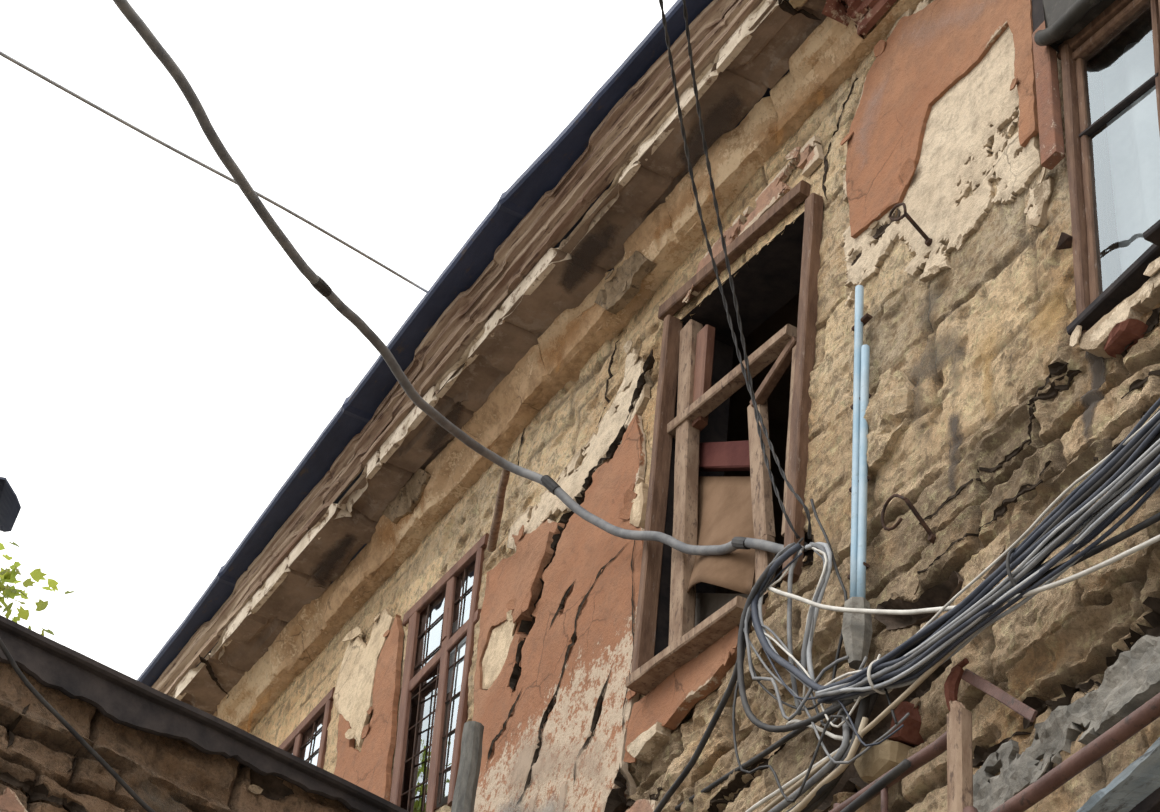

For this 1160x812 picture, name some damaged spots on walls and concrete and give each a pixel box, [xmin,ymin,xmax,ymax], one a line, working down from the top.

spalling [789,0,807,9]
crack [778,0,821,20]
spalling [594,251,656,315]
flaking render [682,135,824,303]
crack [822,78,859,199]
flaking render [840,0,1055,308]
crack [1093,307,1160,461]
crack [917,362,1082,577]
crack [484,340,655,805]
flaking render [472,340,739,812]
crack [0,704,87,812]
flaking render [333,608,404,801]